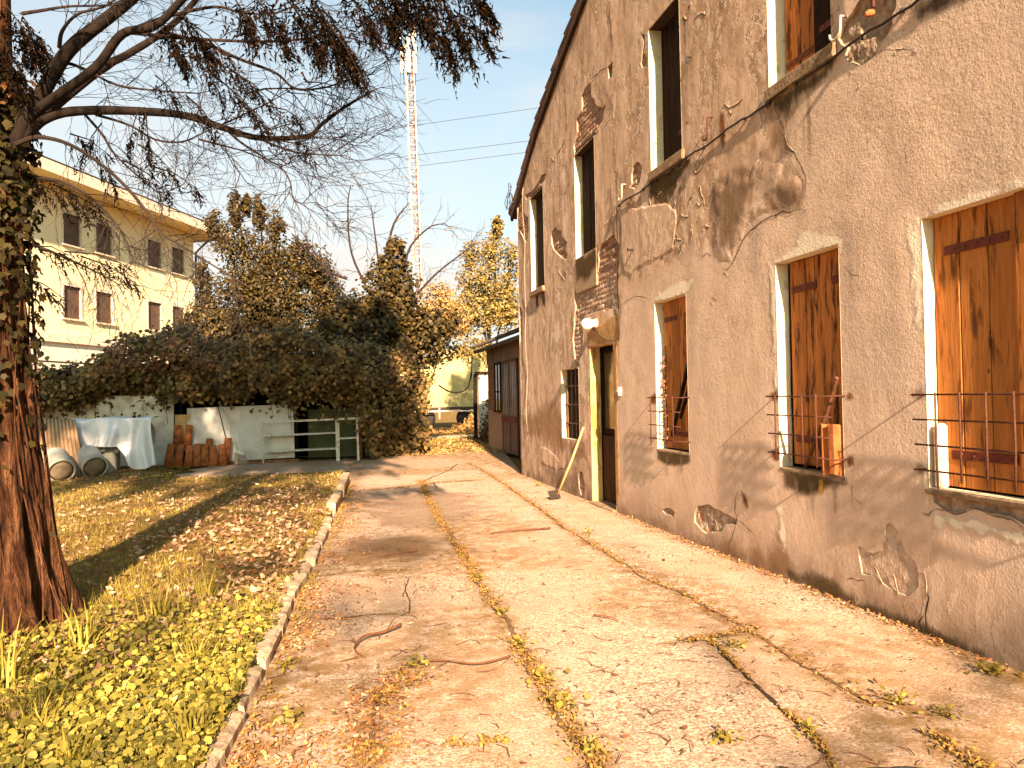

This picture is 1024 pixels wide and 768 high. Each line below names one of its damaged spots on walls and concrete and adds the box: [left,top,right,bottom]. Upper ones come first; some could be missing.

spalling [573,82,606,155]
damp [713,171,746,242]
crack [724,106,806,270]
damp [767,170,801,210]
spalling [551,227,567,281]
peeling [572,169,709,369]
spalling [922,423,1024,529]
spalling [694,504,738,534]
spalling [847,523,919,597]